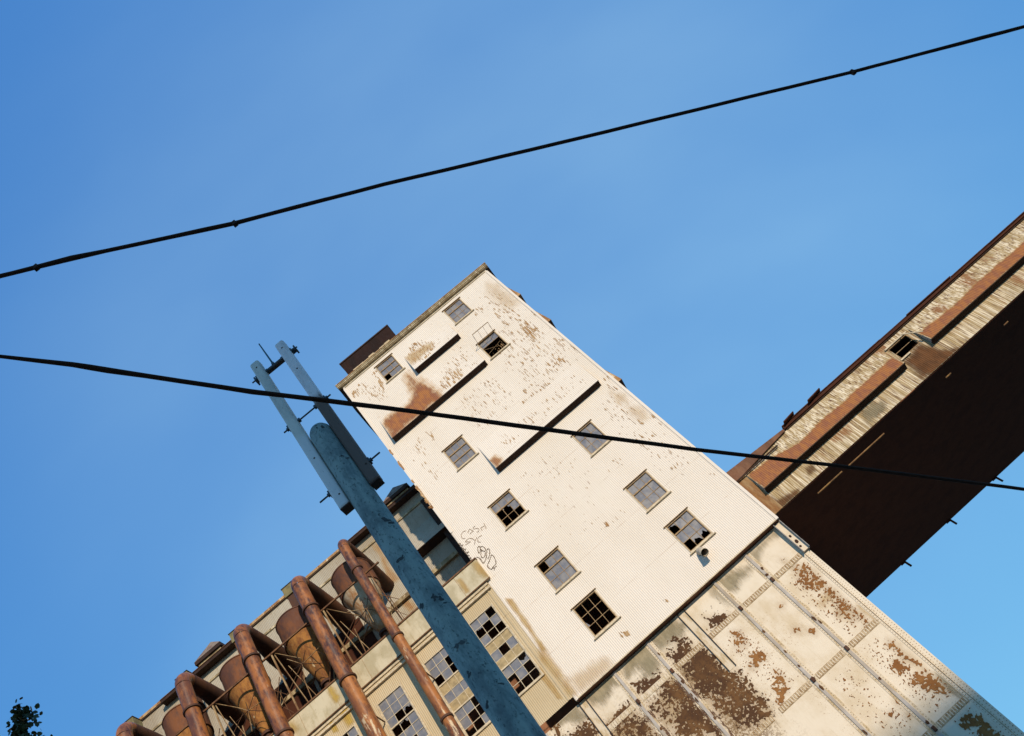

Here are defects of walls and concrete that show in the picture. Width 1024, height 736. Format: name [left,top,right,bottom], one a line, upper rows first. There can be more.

peeling [352,371,387,401]
rust [384,374,442,437]
peeling [408,341,438,363]
peeling [440,347,478,389]
peeling [456,291,583,431]